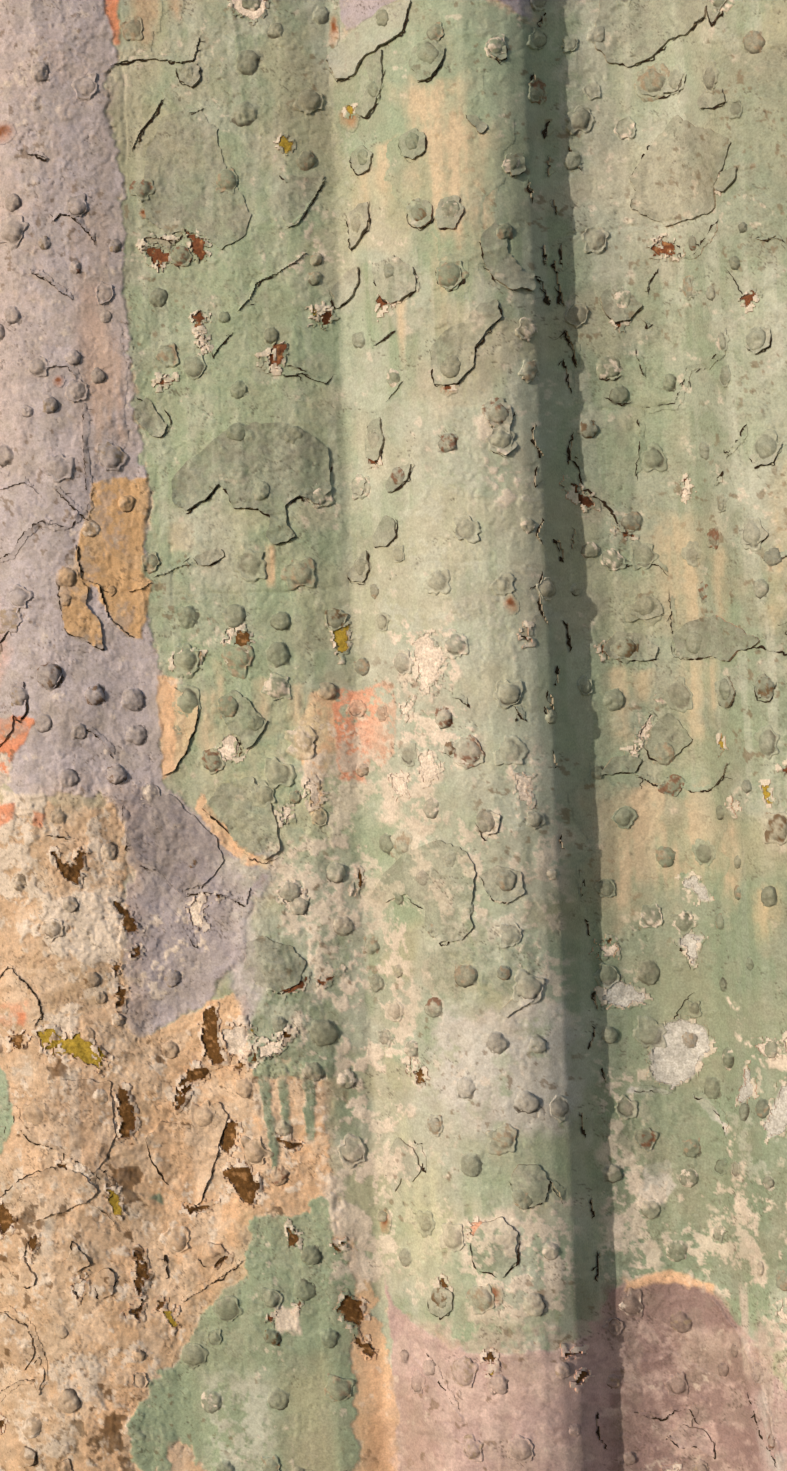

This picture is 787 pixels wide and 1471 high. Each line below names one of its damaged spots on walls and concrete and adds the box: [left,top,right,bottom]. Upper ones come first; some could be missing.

crack [111,36,204,66]
crack [132,99,203,151]
peeling [135,107,251,273]
crack [212,175,325,359]
peeling [305,201,465,331]
peeling [326,0,445,119]
crack [526,72,730,479]
crack [510,423,579,768]
peeling [162,623,256,775]
peeling [203,690,329,864]
peeling [46,846,91,889]
crack [0,966,43,1026]